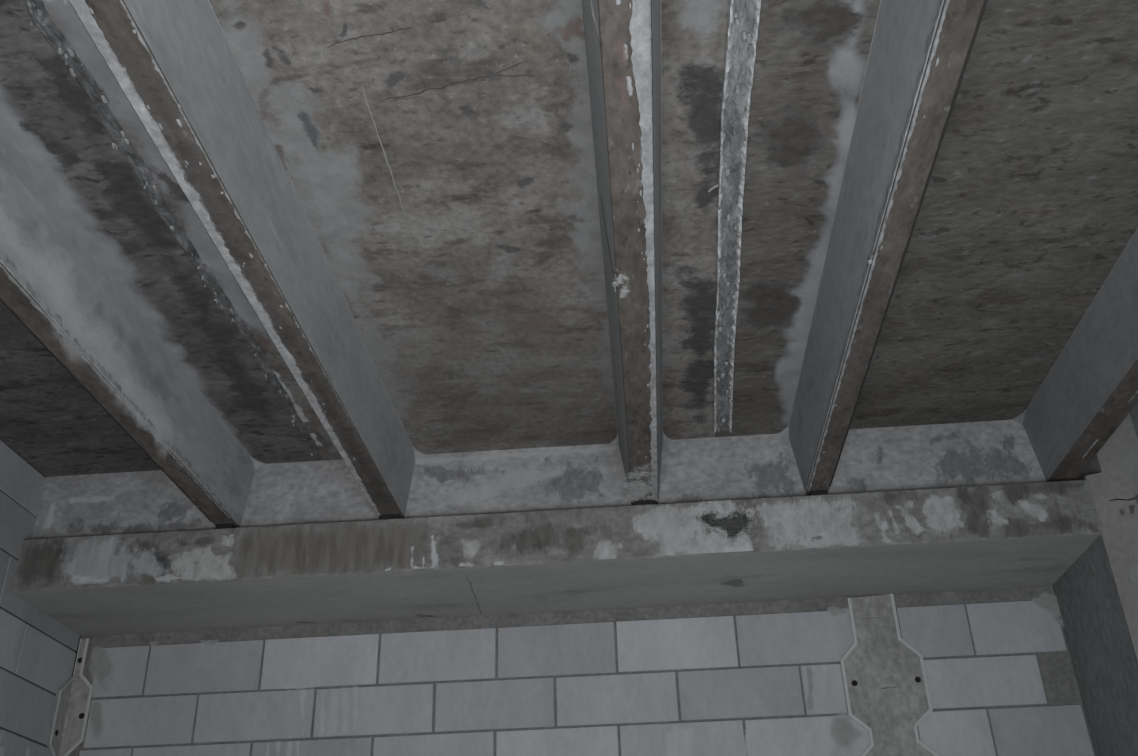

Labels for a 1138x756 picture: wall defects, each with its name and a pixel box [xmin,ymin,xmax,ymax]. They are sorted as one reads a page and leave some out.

water stain [0,0,438,578]
crack [383,61,534,101]
water stain [544,0,615,399]
water stain [617,0,658,501]
water stain [676,267,719,422]
water stain [677,62,725,212]
water stain [682,0,722,38]
water stain [739,0,950,498]
water stain [674,493,702,503]
water stain [844,430,1099,543]